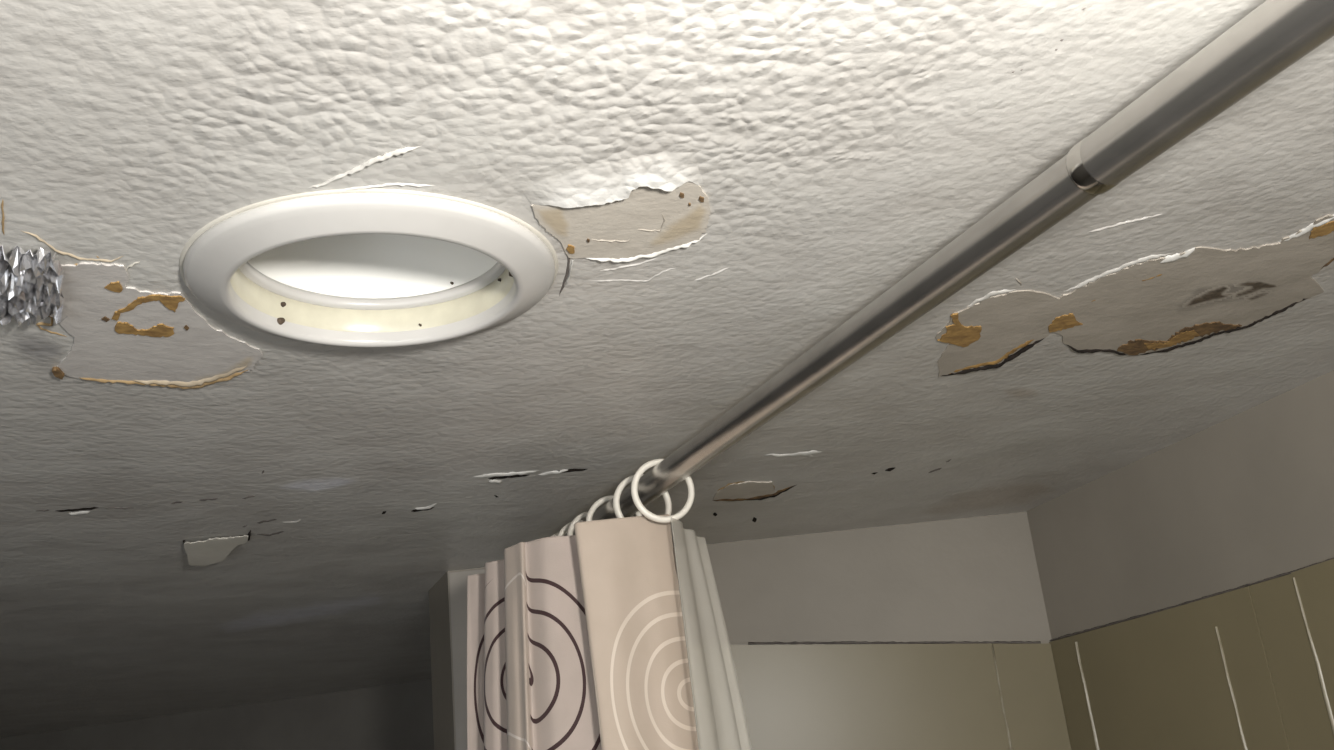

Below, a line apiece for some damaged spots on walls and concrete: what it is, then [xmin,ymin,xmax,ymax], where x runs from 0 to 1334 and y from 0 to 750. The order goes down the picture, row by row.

peeling [522,150,711,263]
peeling [22,231,263,389]
peeling [935,214,1334,377]
crack [36,507,132,516]
peeling [183,519,301,567]
crack [382,503,437,514]